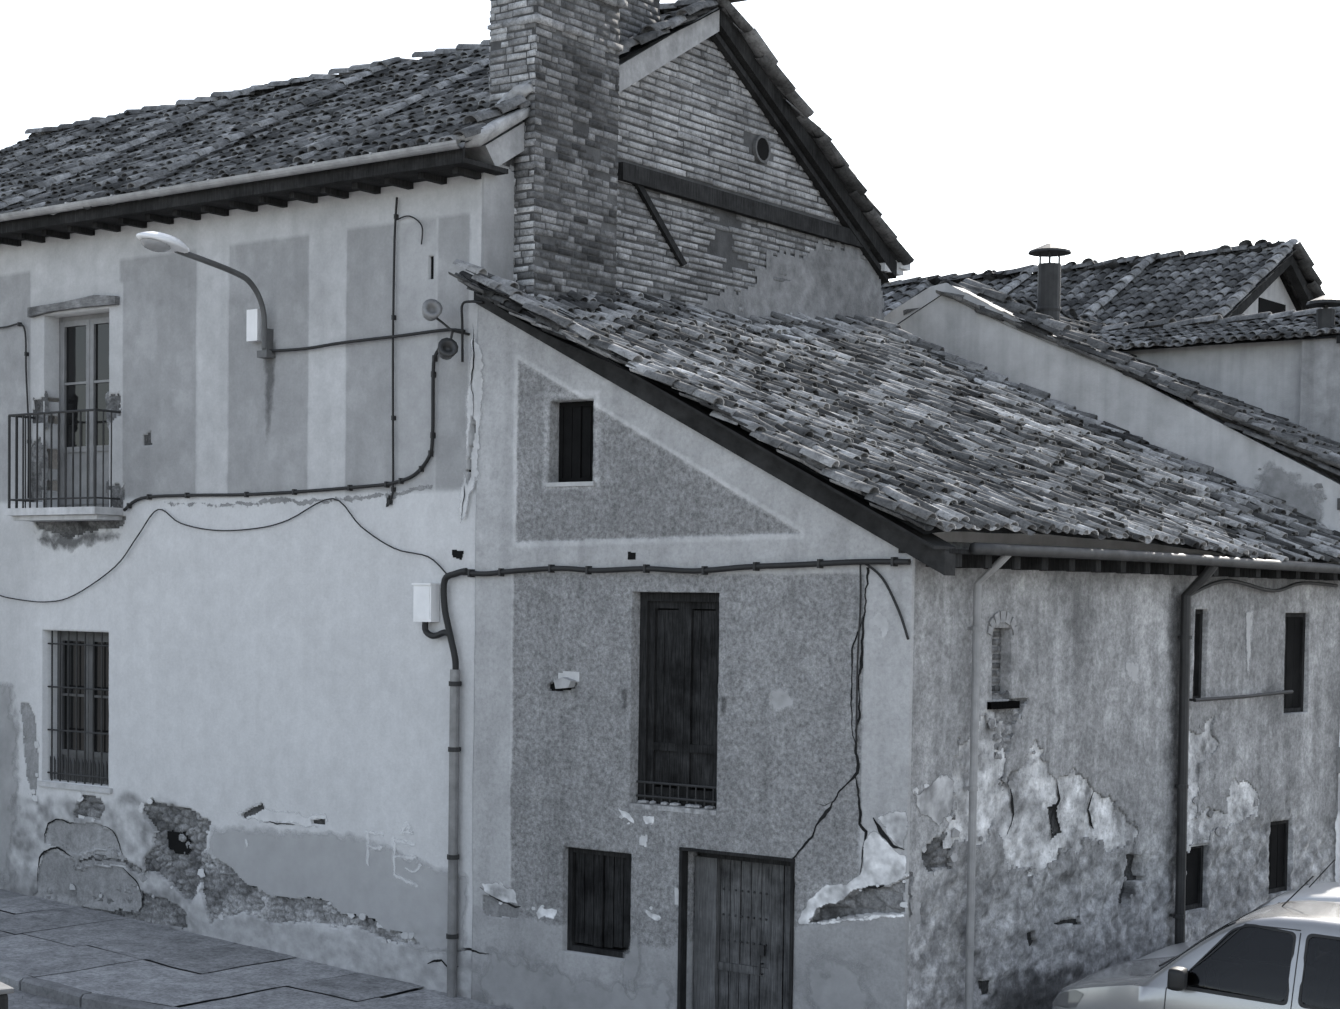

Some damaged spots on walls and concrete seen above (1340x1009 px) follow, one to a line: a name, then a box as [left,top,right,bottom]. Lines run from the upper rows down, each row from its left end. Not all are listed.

flaking render [19,703,40,805]
spalling [34,791,420,945]
flaking render [480,882,557,919]
crack [792,567,870,859]
flaking render [798,690,1147,925]
flaking render [1187,718,1259,853]